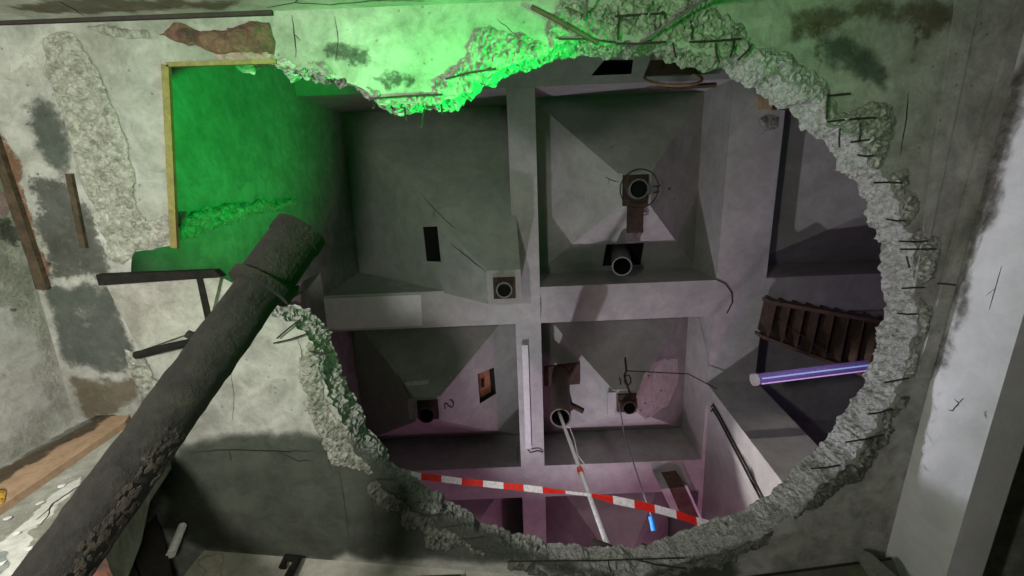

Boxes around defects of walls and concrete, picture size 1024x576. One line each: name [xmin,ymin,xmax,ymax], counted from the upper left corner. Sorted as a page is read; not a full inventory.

water stain [31,99,70,169]
water stain [0,178,137,482]
spalling [236,0,956,576]
water stain [792,0,951,42]
water stain [954,63,1024,316]